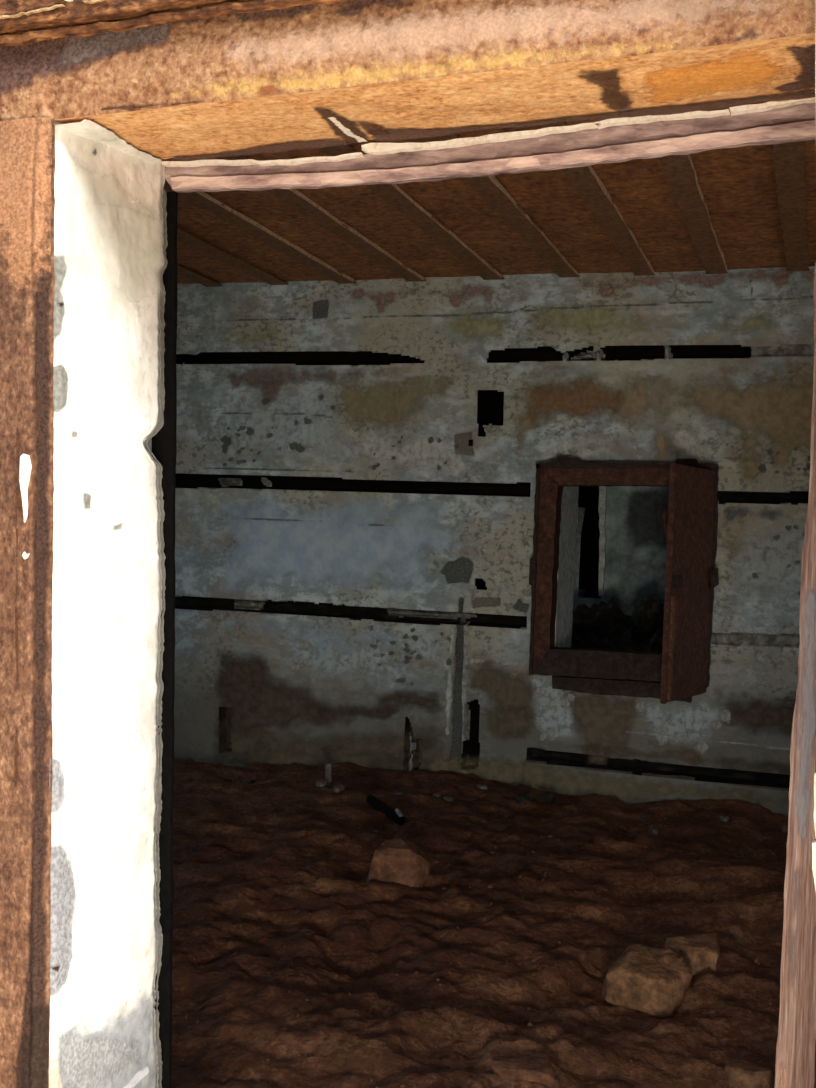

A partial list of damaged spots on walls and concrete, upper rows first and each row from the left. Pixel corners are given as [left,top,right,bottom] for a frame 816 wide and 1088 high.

leakage [231,369,449,426]
spalling [145,188,168,1088]
leakage [216,654,768,801]
leakage [726,698,796,733]
spalling [60,1031,141,1088]